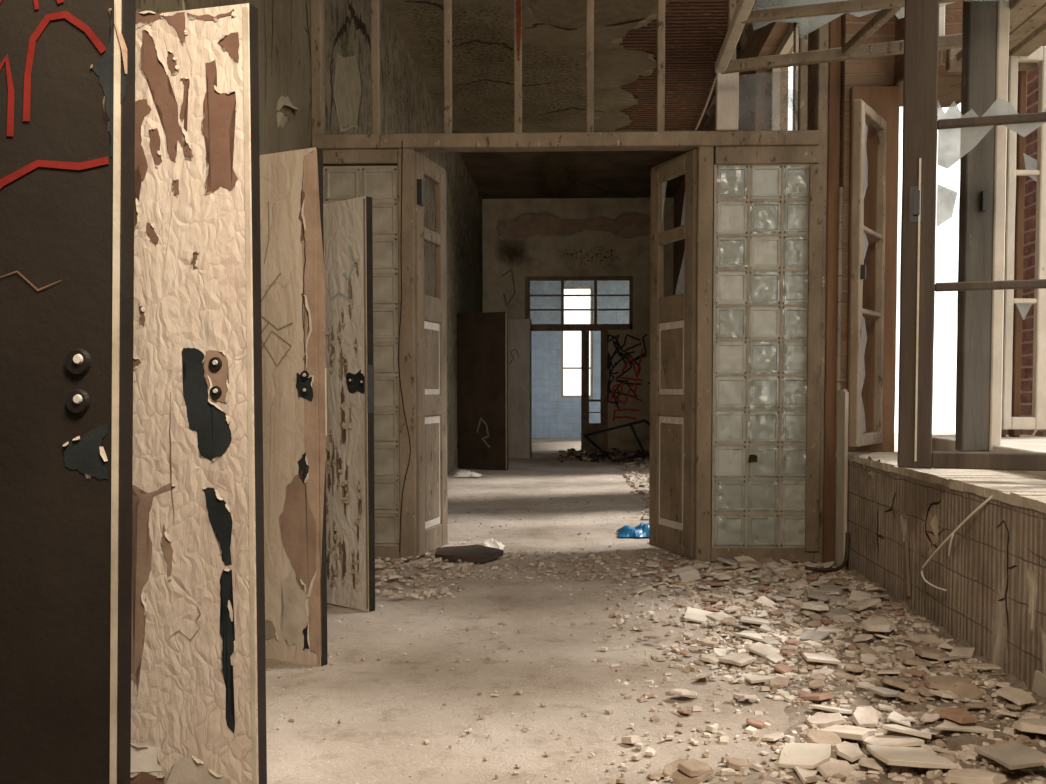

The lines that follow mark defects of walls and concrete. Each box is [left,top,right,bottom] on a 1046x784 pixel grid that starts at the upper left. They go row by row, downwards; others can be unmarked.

flaking render [526,0,668,31]
flaking render [496,212,651,239]
crack [877,493,896,562]
crack [925,500,945,548]
crack [997,520,1046,642]